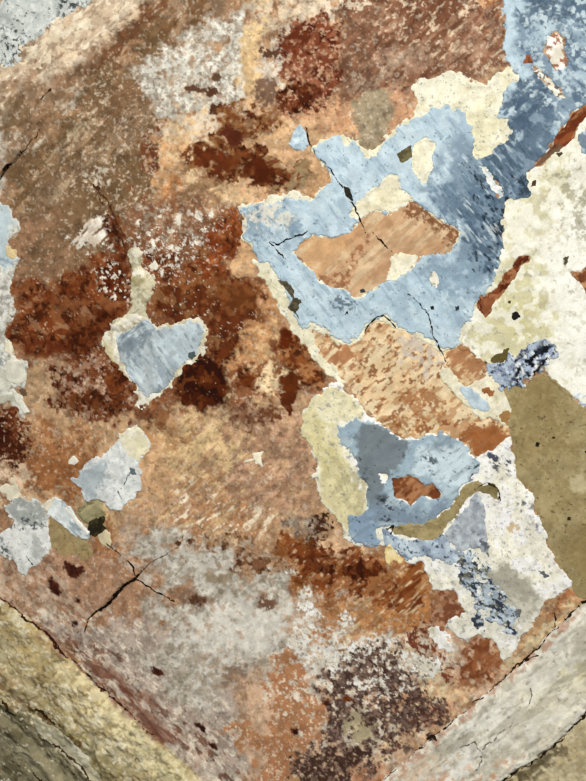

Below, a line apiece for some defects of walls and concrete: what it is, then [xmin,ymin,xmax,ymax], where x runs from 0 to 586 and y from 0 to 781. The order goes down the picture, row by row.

corrosion [0,404,37,474]
peeling [0,0,133,89]
peeling [0,425,151,576]
peeling [101,313,208,410]
corrosion [5,201,335,437]
corrosion [178,5,349,197]
crack [269,231,307,259]
crack [306,127,392,252]
peeling [237,0,586,679]
crack [1,536,183,735]
corrosion [173,506,507,697]
crack [380,600,586,781]